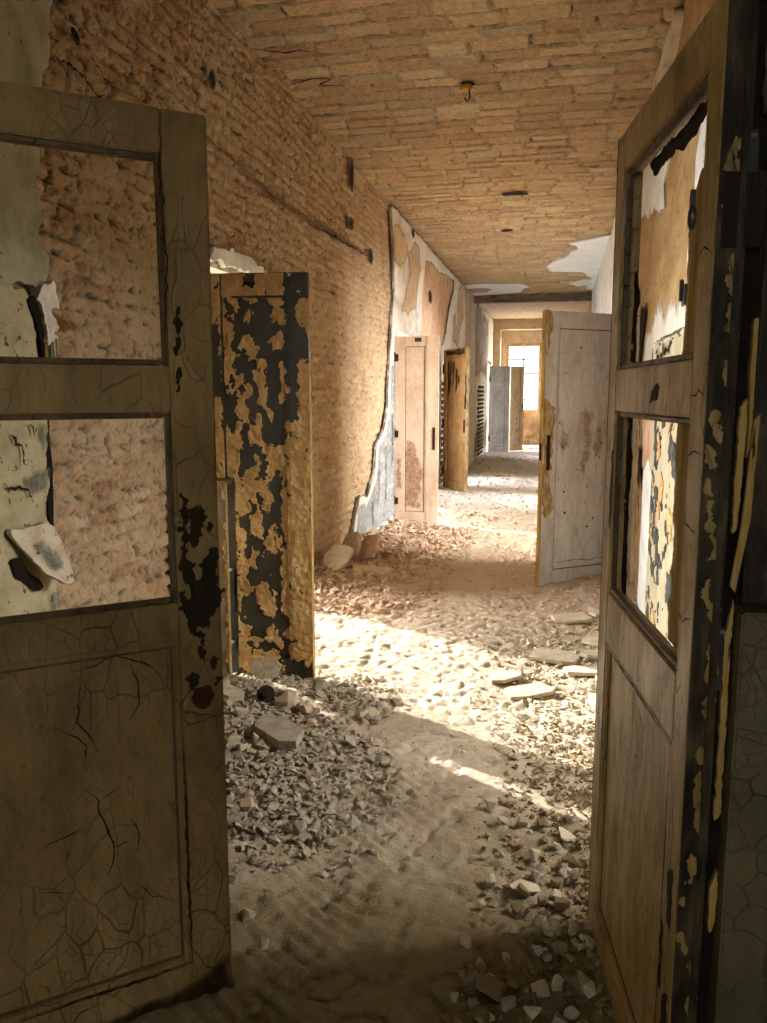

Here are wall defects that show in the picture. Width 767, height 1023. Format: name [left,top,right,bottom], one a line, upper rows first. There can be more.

peeling [0,0,69,88]
peeling [0,142,50,357]
peeling [0,420,59,617]
peeling [173,306,183,393]
peeling [177,247,314,686]
peeling [351,206,530,533]
peeling [546,219,615,314]
peeling [185,672,200,691]